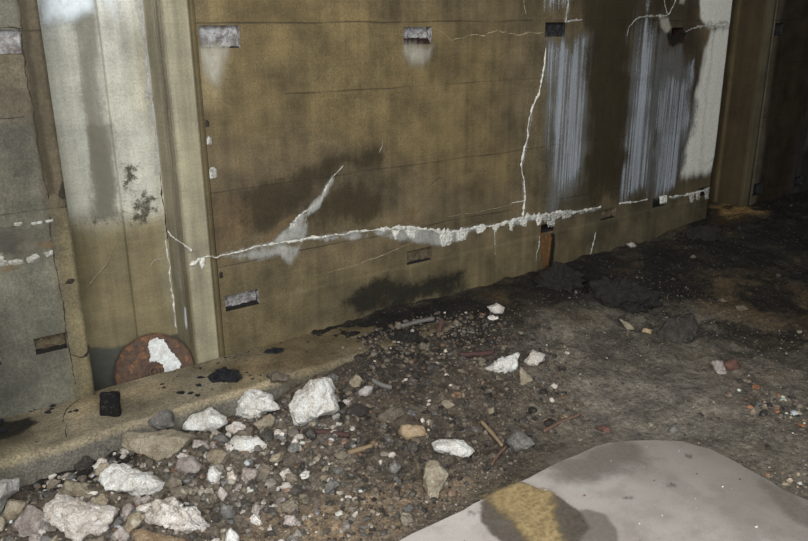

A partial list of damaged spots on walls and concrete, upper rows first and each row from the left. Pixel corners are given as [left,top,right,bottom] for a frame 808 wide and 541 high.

crack [565,0,583,22]
crack [627,0,724,36]
leakage [545,0,732,206]
crack [151,28,710,328]
leakage [348,272,462,314]